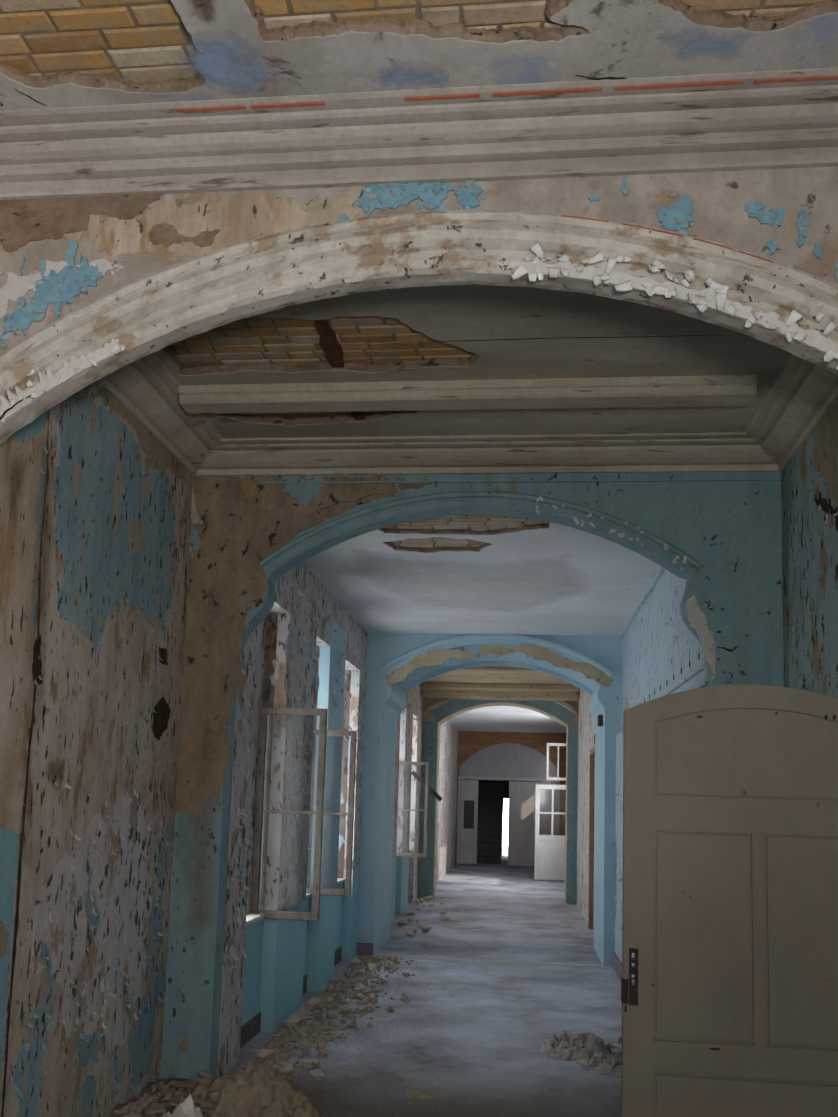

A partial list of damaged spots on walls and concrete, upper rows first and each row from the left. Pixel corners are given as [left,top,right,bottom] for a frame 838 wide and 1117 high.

flaking render [0,0,205,93]
flaking render [245,0,591,43]
flaking render [660,0,838,31]
flaking render [0,180,486,349]
flaking render [164,316,480,375]
peeling [511,242,838,370]
crack [0,395,49,638]
flaking render [379,496,688,573]
peeling [0,337,432,1007]
peeling [386,643,614,687]
crack [1,684,36,1117]
peeling [13,788,171,1117]